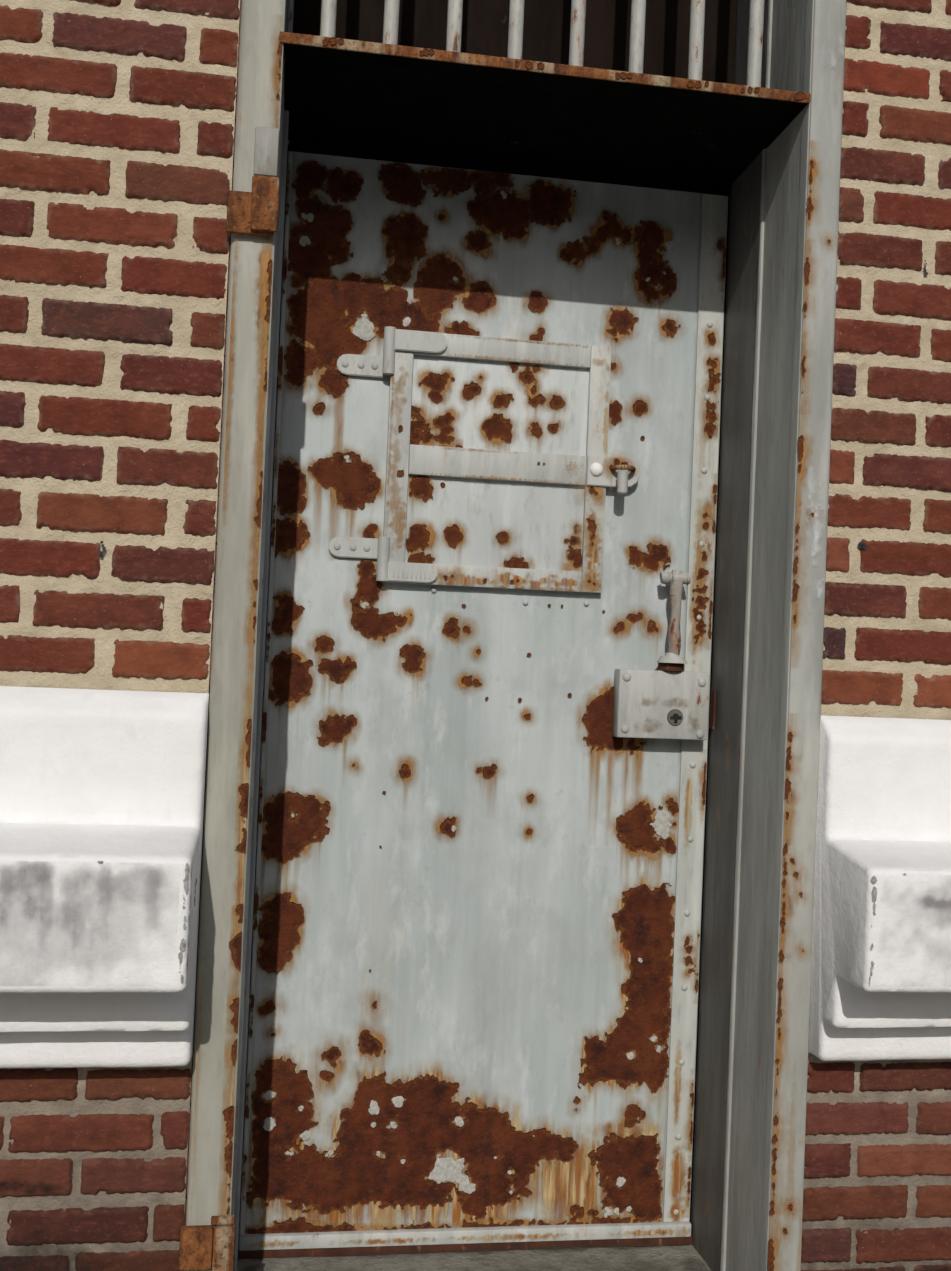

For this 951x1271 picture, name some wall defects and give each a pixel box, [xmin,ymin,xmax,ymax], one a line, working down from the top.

rust [558,210,681,343]
rust [603,395,649,452]
rust [704,330,721,438]
rust [229,161,604,975]
rust [625,540,671,573]
rust [692,483,717,650]
rust [602,610,661,637]
rust [579,683,646,782]
rust [613,762,707,867]
damp [9,864,46,917]
rust [768,728,803,1271]
rust [222,877,700,1247]